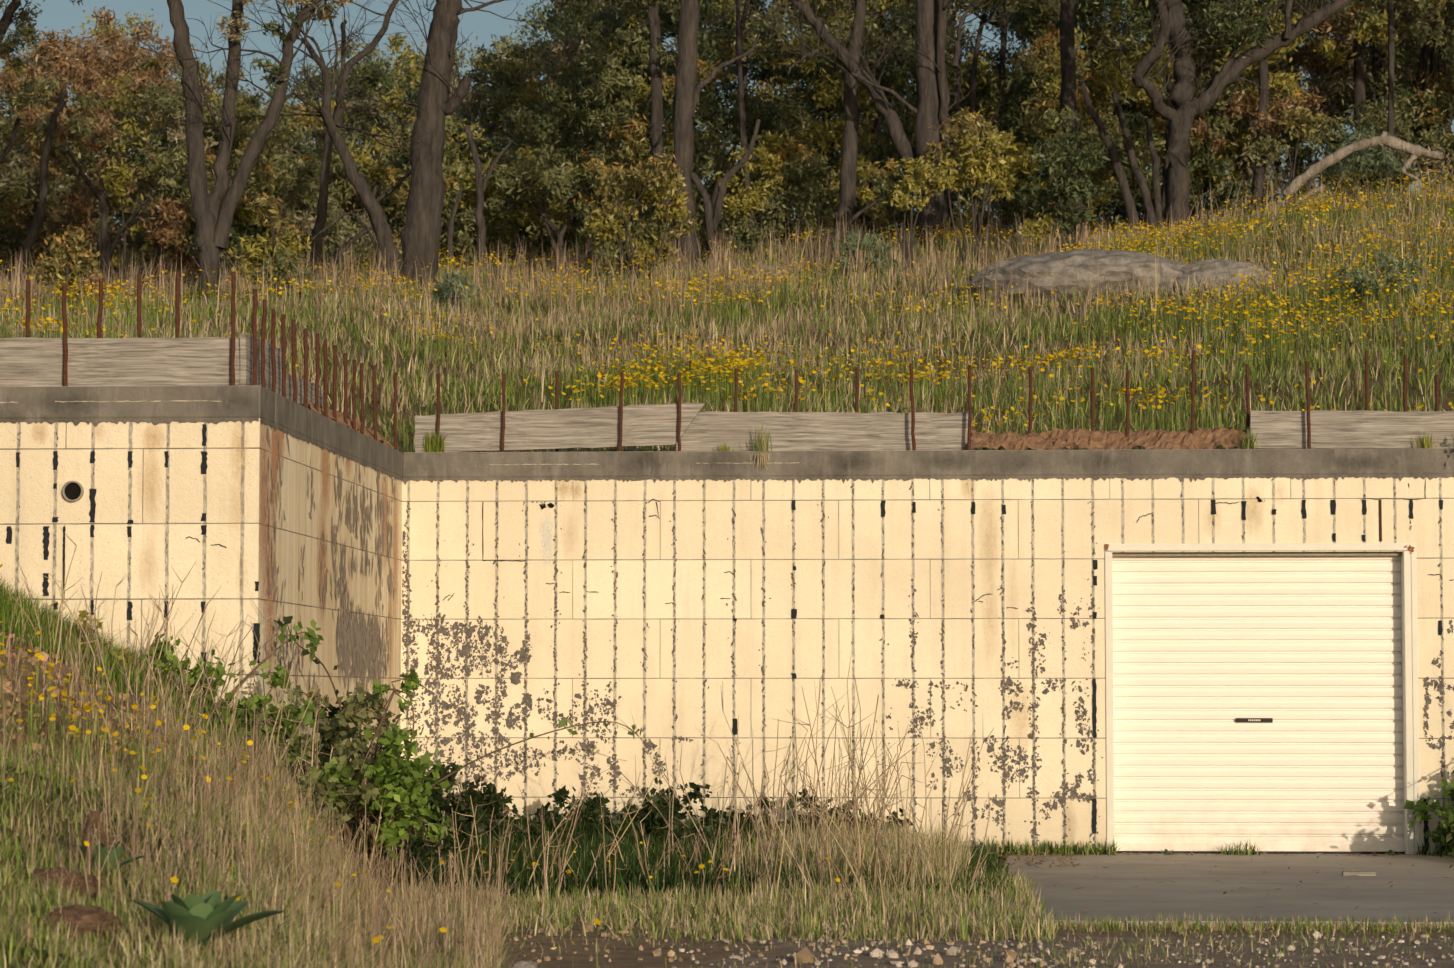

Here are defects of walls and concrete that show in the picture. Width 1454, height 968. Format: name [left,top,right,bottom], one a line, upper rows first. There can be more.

corrosion [260,428,284,636]
peeling [253,428,709,825]
peeling [725,509,741,790]
peeling [758,519,771,752]
peeling [876,478,1103,857]